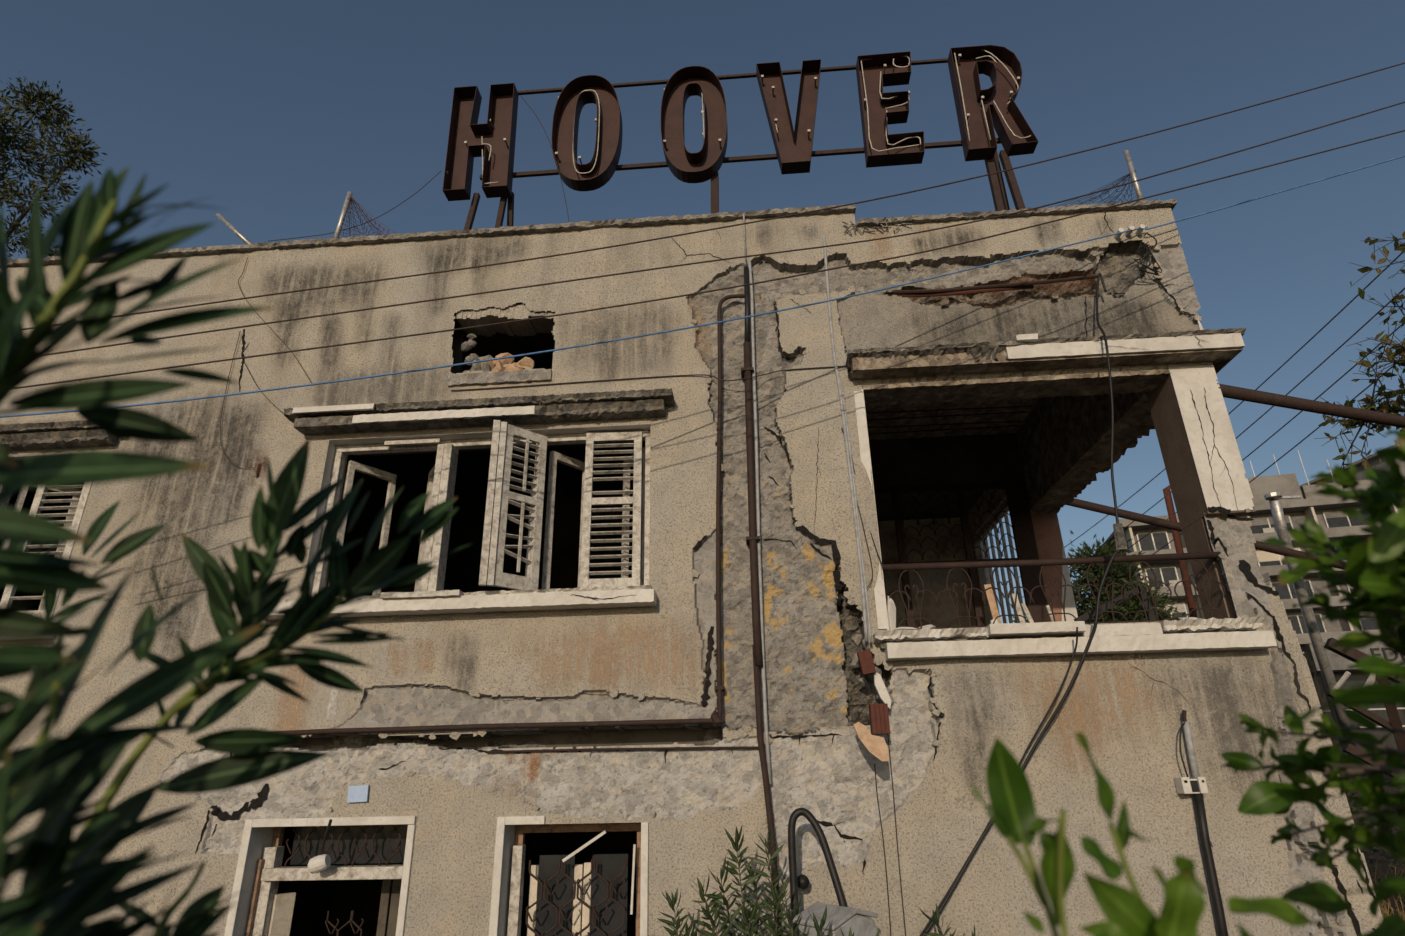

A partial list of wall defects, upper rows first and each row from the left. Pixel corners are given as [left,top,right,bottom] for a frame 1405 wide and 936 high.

spalling [193,240,1201,880]
crack [692,535,707,550]
crack [1190,388,1324,709]
spalling [158,748,234,782]
crack [284,626,733,770]
crack [770,733,842,743]
crack [195,783,269,853]
crack [1331,849,1398,936]